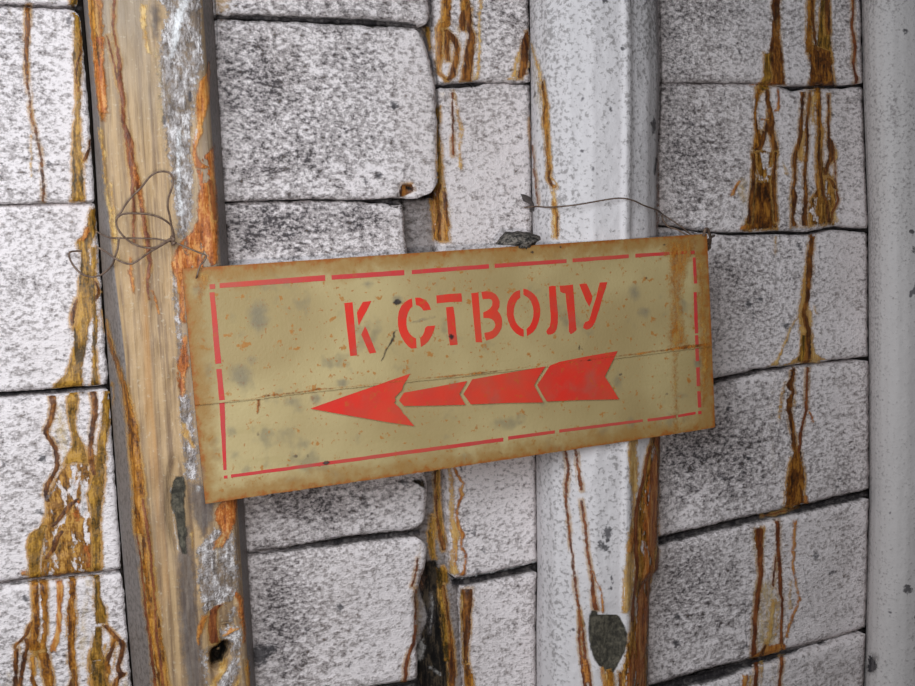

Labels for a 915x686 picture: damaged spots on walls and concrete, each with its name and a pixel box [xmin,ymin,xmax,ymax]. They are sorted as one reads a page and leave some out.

corrosion [425,0,483,82]
corrosion [429,92,463,243]
corrosion [12,0,172,686]
corrosion [730,0,839,686]
corrosion [402,558,418,682]
corrosion [426,467,475,686]
corrosion [564,436,660,686]